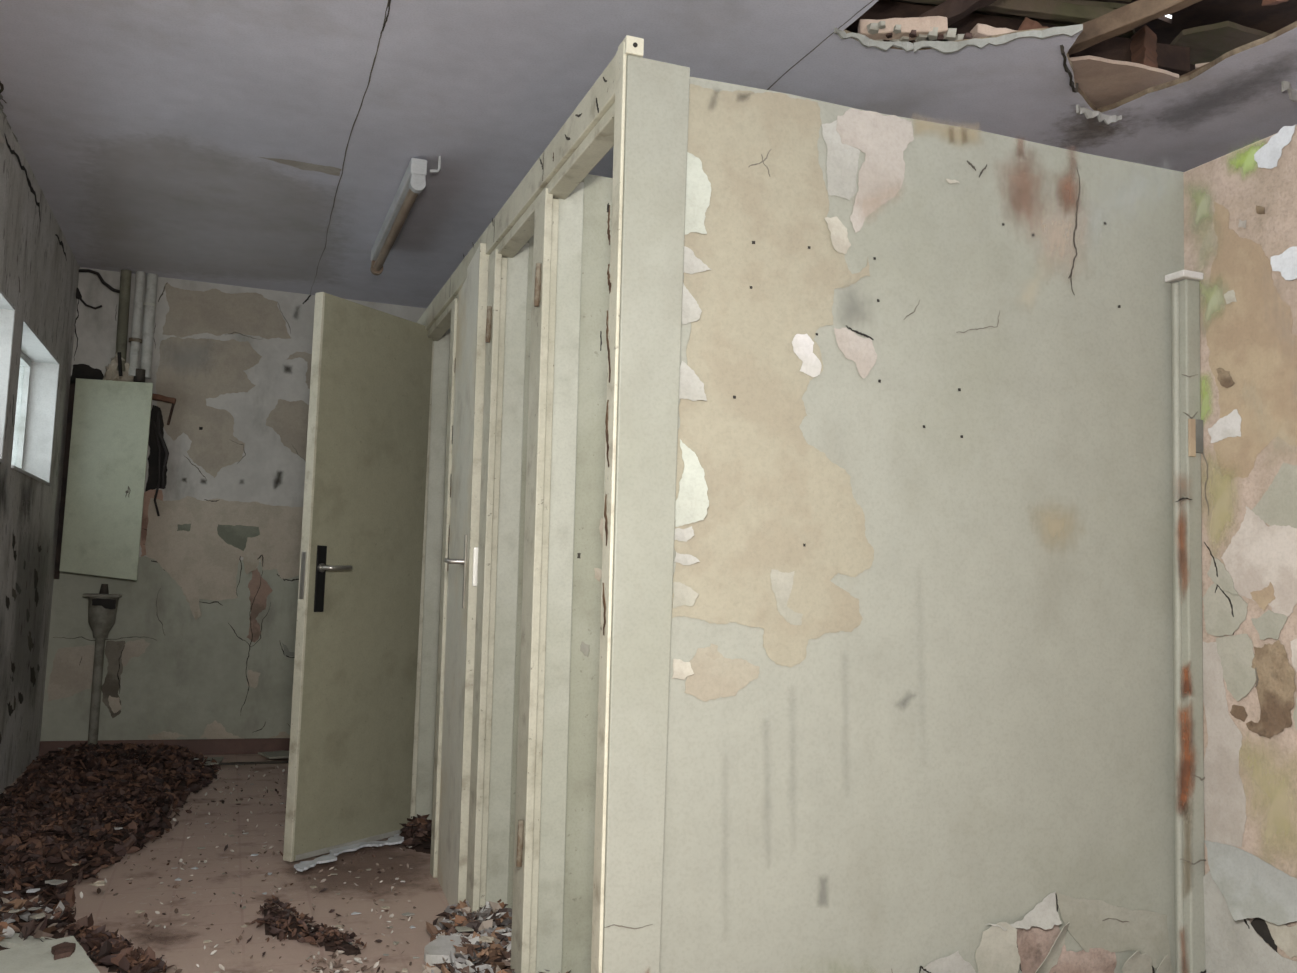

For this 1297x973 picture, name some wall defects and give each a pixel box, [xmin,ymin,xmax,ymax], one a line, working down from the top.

crack [0,135,67,261]
crack [260,0,391,304]
crack [1068,170,1081,295]
peeling [1254,124,1296,169]
peeling [672,84,914,702]
peeling [1202,201,1297,516]
peeling [6,282,312,718]
corrosion [1178,515,1187,584]
corrosion [1177,666,1194,811]
peeling [1202,506,1297,973]
spalling [3,879,67,919]
peeling [921,891,1173,973]